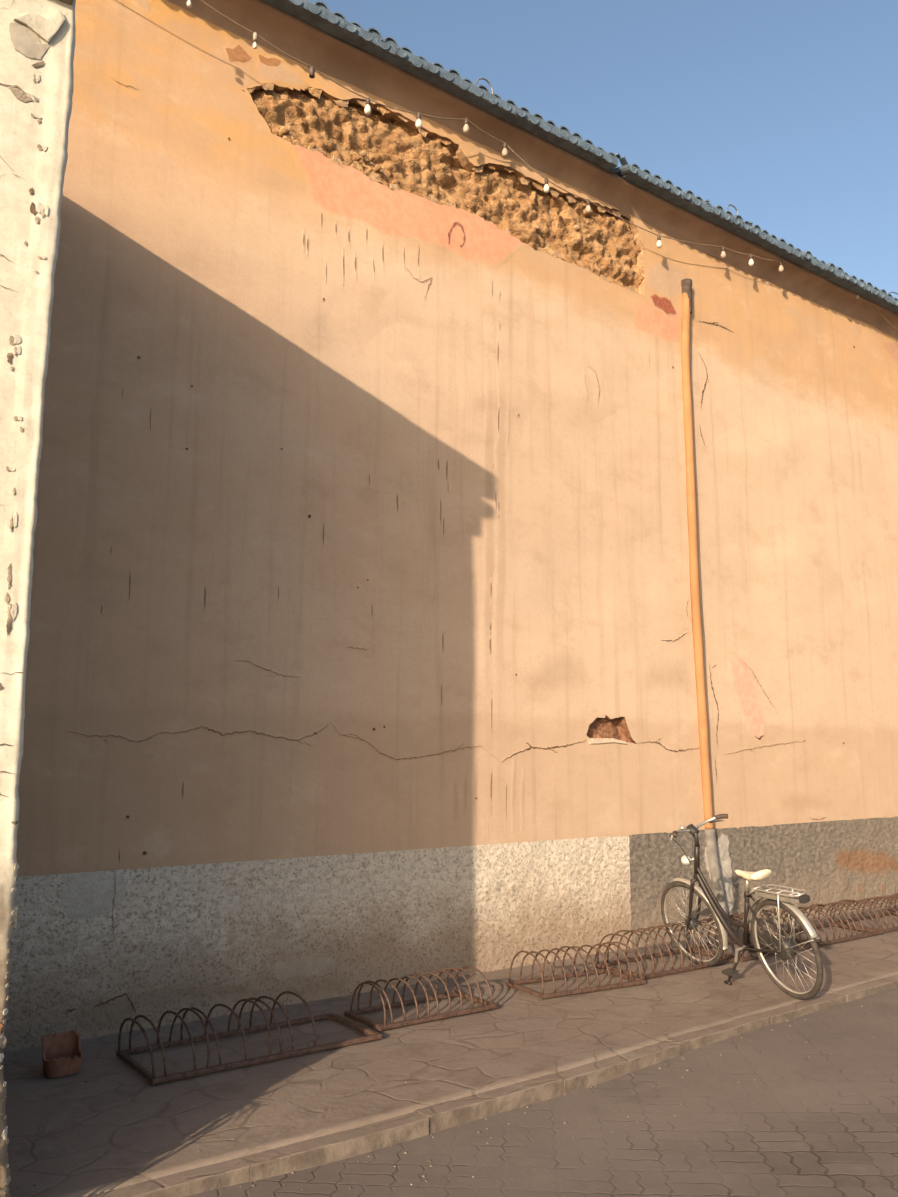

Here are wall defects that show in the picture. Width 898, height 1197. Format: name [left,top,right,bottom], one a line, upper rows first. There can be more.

crack [0,83,38,102]
spalling [224,43,687,317]
spalling [29,188,49,224]
spalling [7,334,22,371]
spalling [5,564,17,636]
crack [67,721,586,762]
spalling [586,715,637,744]